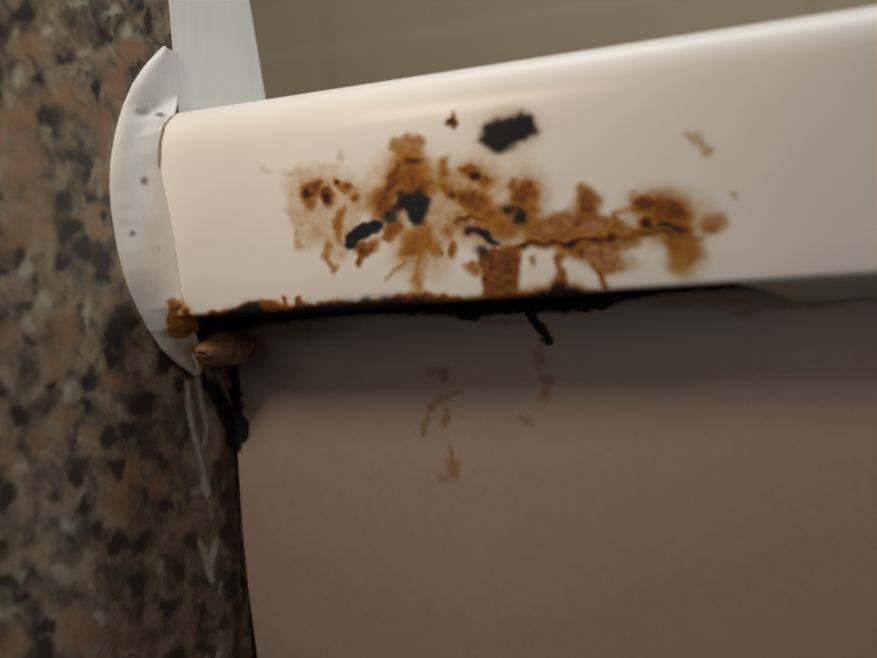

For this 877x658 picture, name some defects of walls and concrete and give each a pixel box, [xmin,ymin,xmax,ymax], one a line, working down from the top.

corrosion [445,112,458,129]
peeling [478,111,537,152]
corrosion [299,134,550,303]
crack [196,183,747,346]
corrosion [630,190,726,271]
corrosion [166,295,344,370]